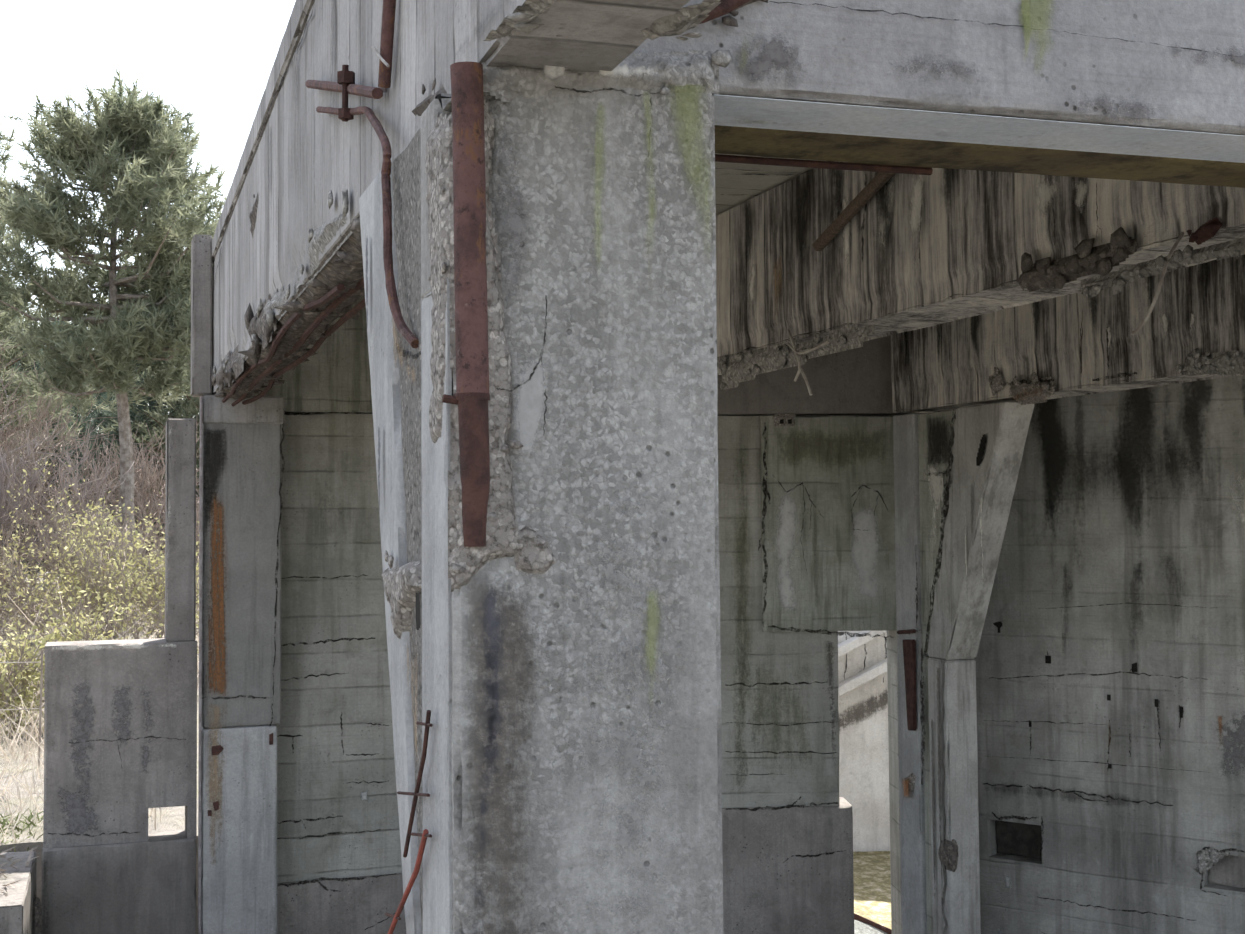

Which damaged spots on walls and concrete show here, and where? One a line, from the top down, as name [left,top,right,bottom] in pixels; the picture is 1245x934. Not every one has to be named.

spalling [211,189,366,407]
spalling [412,0,801,592]
spalling [1017,217,1245,299]
rust [208,497,226,854]
crack [202,412,375,753]
crack [277,816,390,839]
crack [340,713,389,784]
water stain [472,584,533,934]
crack [726,721,838,811]
crack [726,422,920,687]
water stain [1036,380,1212,521]